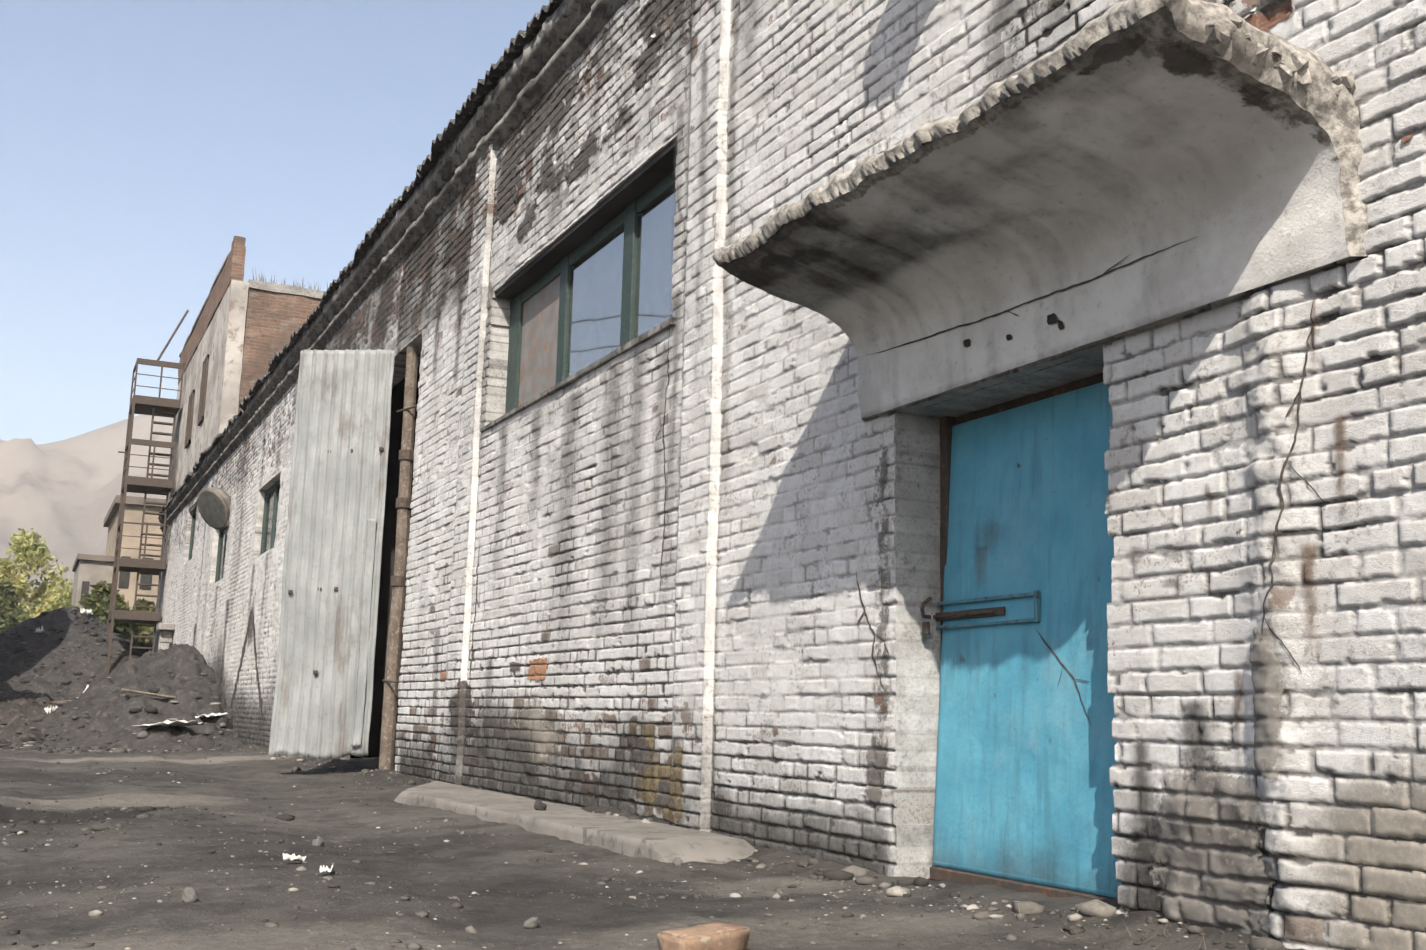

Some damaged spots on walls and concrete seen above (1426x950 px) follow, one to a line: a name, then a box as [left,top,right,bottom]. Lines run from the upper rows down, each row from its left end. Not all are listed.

damp [994,0,1016,65]
peeling [1006,0,1104,69]
spalling [1078,37,1214,77]
spalling [1244,0,1295,33]
spalling [1238,83,1274,112]
crack [868,237,1195,355]
crack [1261,292,1326,674]
peeling [441,669,477,747]
peeling [505,658,561,768]